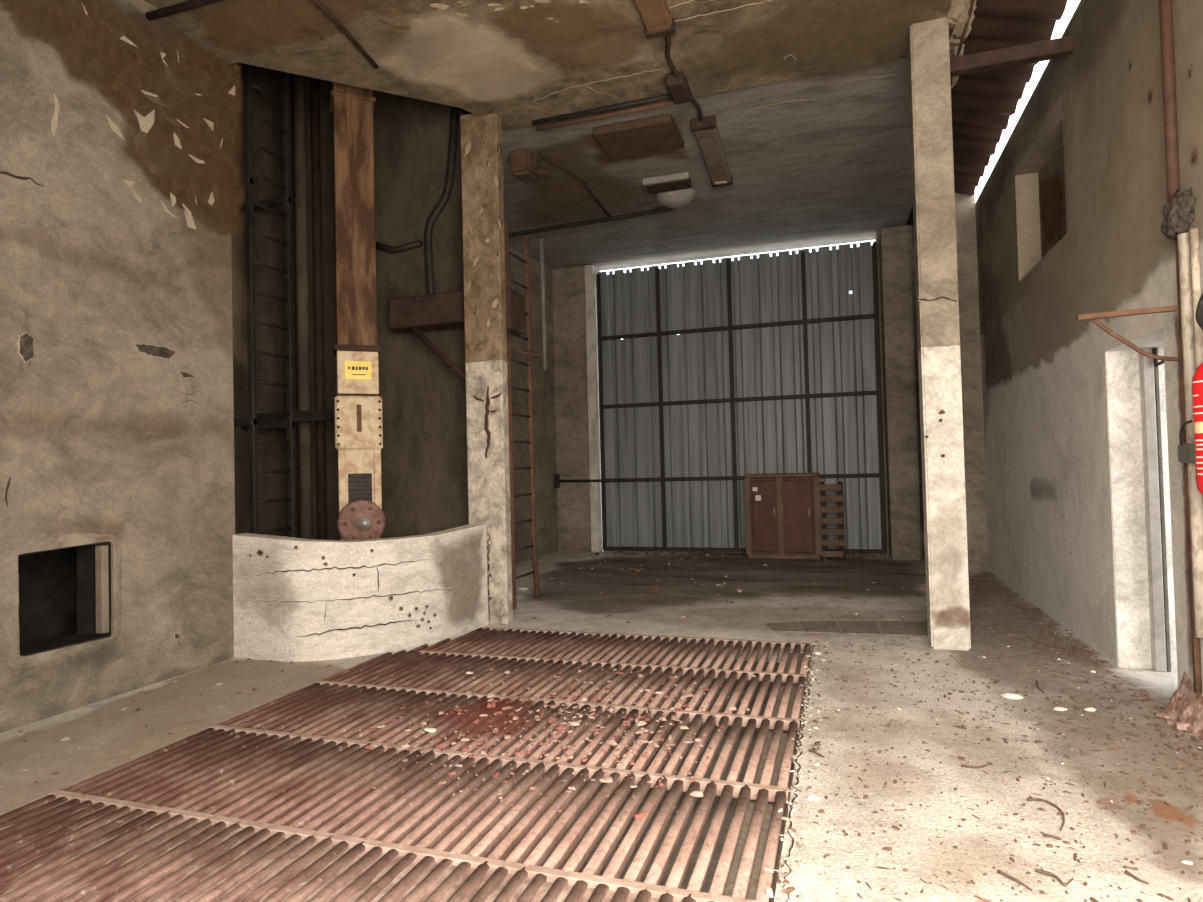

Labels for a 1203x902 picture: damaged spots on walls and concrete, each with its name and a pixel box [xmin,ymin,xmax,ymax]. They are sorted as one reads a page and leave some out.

crack [0,170,45,188]
flaking render [17,331,35,363]
crack [473,386,502,458]
crack [233,558,451,638]
water stain [439,536,481,620]